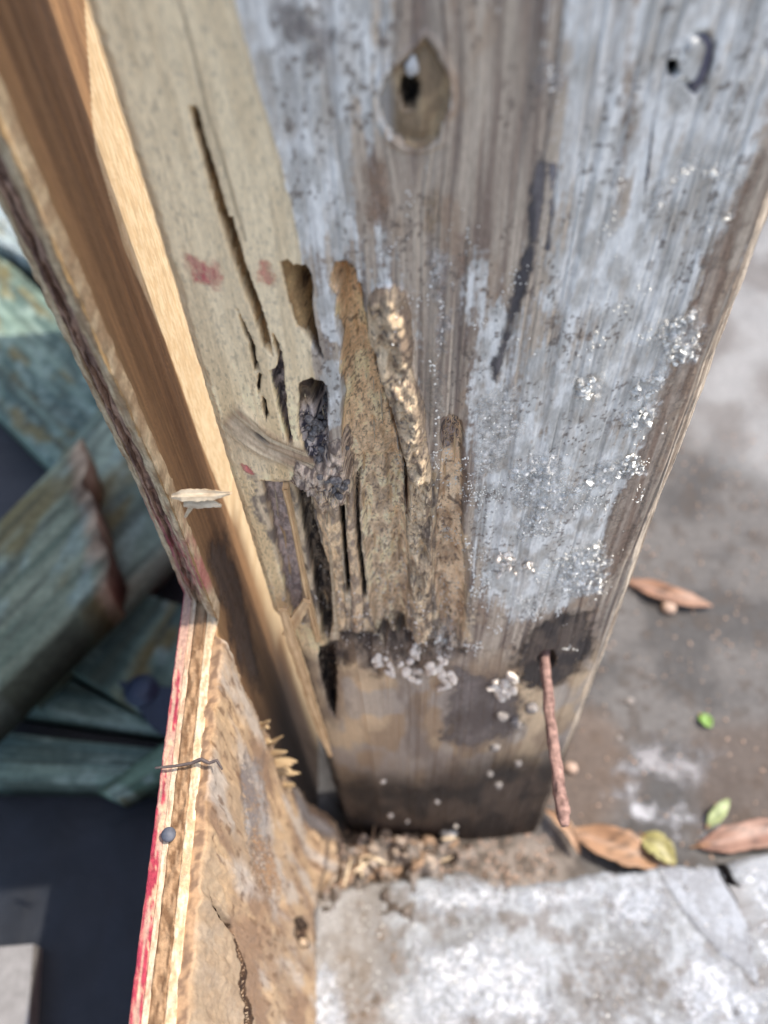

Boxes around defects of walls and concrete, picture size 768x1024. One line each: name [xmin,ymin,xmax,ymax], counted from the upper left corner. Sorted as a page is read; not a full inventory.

crack [195,107,271,417]
peeling [428,252,452,445]
water stain [438,667,523,746]
water stain [321,736,572,839]
crack [211,900,254,1024]